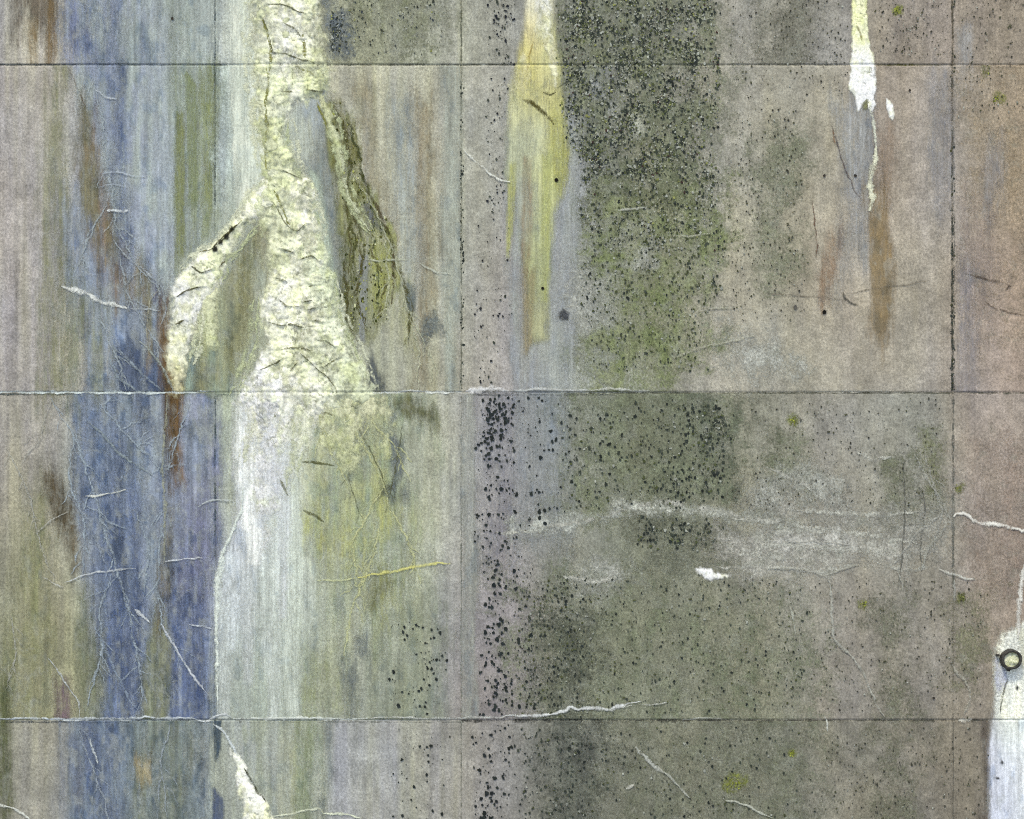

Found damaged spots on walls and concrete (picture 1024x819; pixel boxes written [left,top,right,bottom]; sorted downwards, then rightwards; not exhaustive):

corrosion [80,103,183,483]
damp [61,0,415,819]
crack [0,69,719,819]
damp [505,0,579,506]
spalling [497,462,955,585]
corrosion [870,127,893,337]
crack [894,452,1024,597]